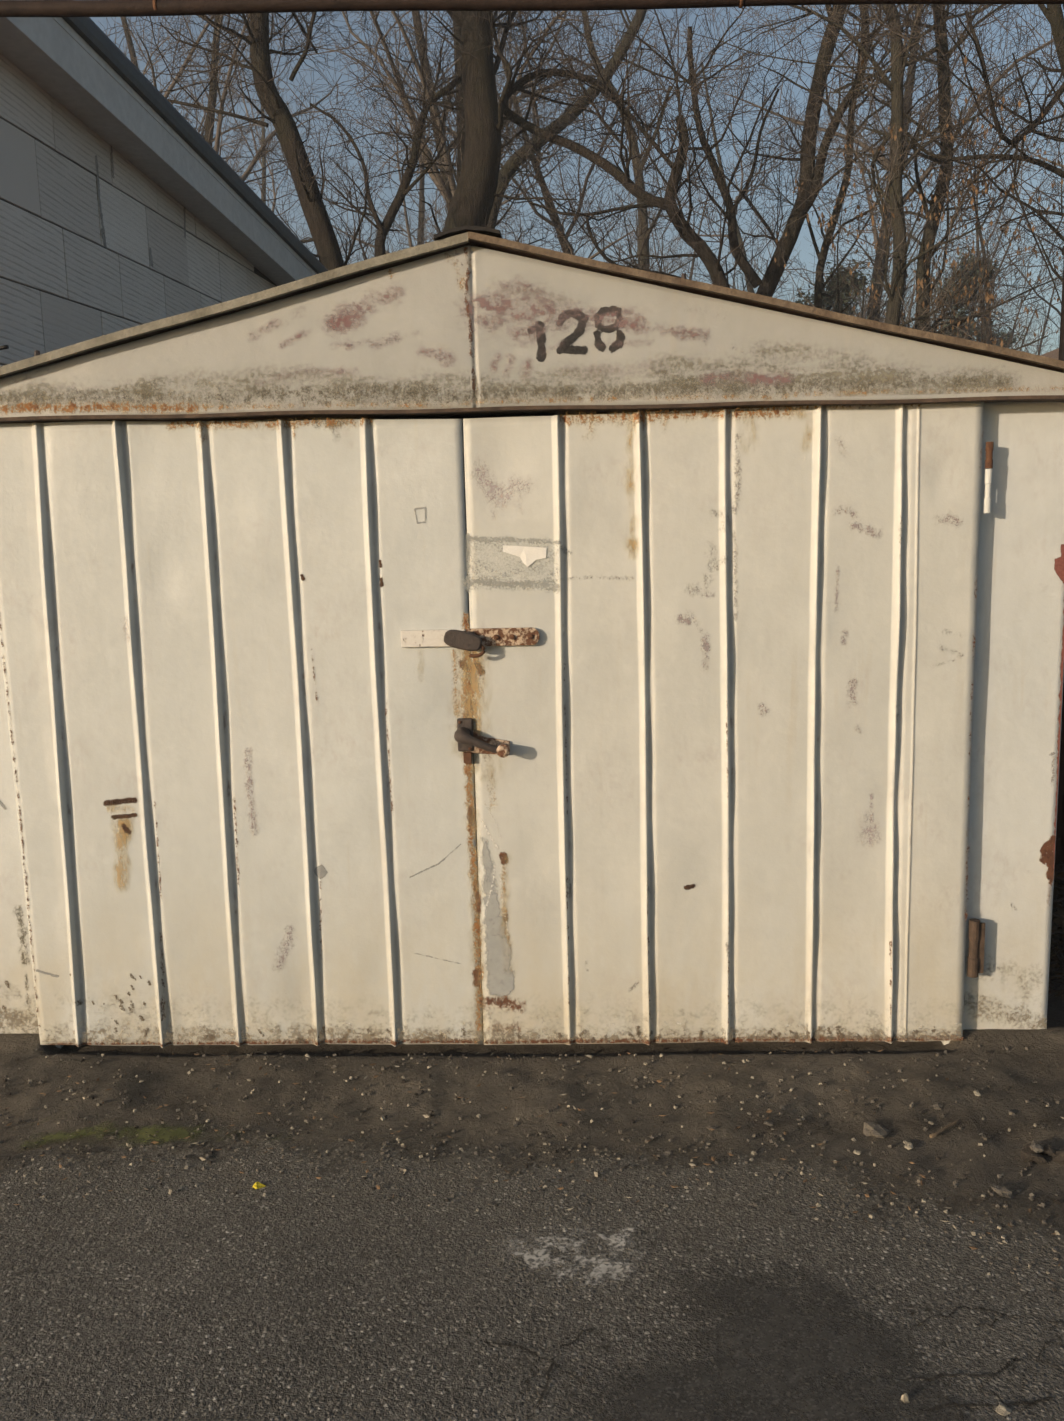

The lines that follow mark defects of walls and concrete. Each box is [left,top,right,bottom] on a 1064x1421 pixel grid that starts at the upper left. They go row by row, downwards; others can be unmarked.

corrosion [0,401,373,440]
corrosion [453,650,485,734]
corrosion [0,625,41,1027]
peeling [482,841,514,997]
corrosion [50,763,963,1047]
corrosion [1039,835,1056,886]